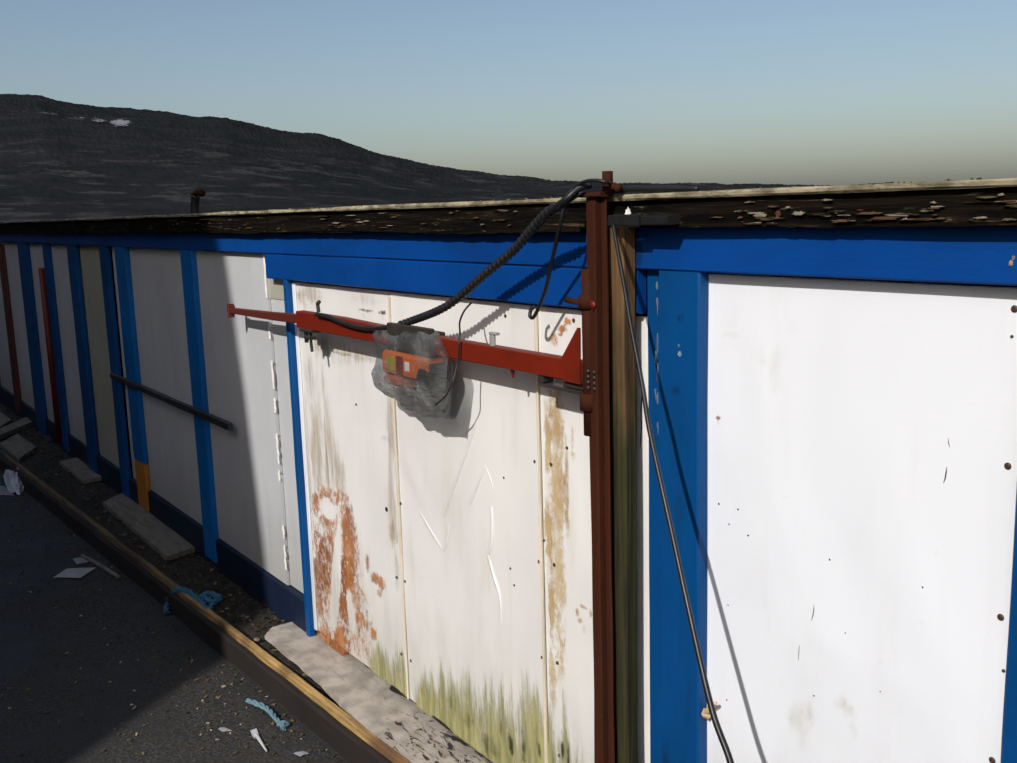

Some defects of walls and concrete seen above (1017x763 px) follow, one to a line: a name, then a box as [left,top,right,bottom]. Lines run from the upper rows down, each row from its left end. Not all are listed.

peeling [734,199,946,224]
peeling [974,193,1017,221]
rust [313,488,384,655]